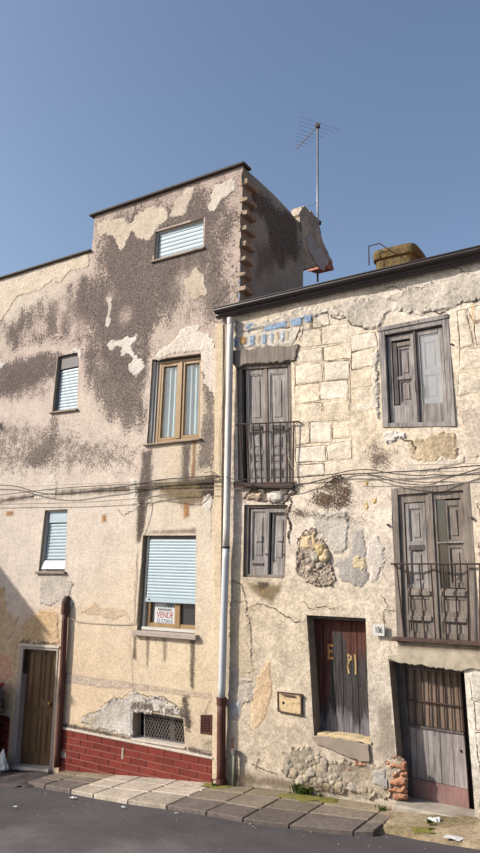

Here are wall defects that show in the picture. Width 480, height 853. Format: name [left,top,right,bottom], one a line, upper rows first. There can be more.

peeling [97,187,195,250]
damp [251,191,302,269]
damp [0,176,240,541]
peeling [107,335,145,378]
peeling [155,324,215,398]
damp [233,330,288,347]
spalling [384,408,480,474]
mould [288,470,375,525]
spalling [243,488,350,588]
crack [229,580,337,643]
peeling [0,574,74,721]
spalling [81,689,182,738]